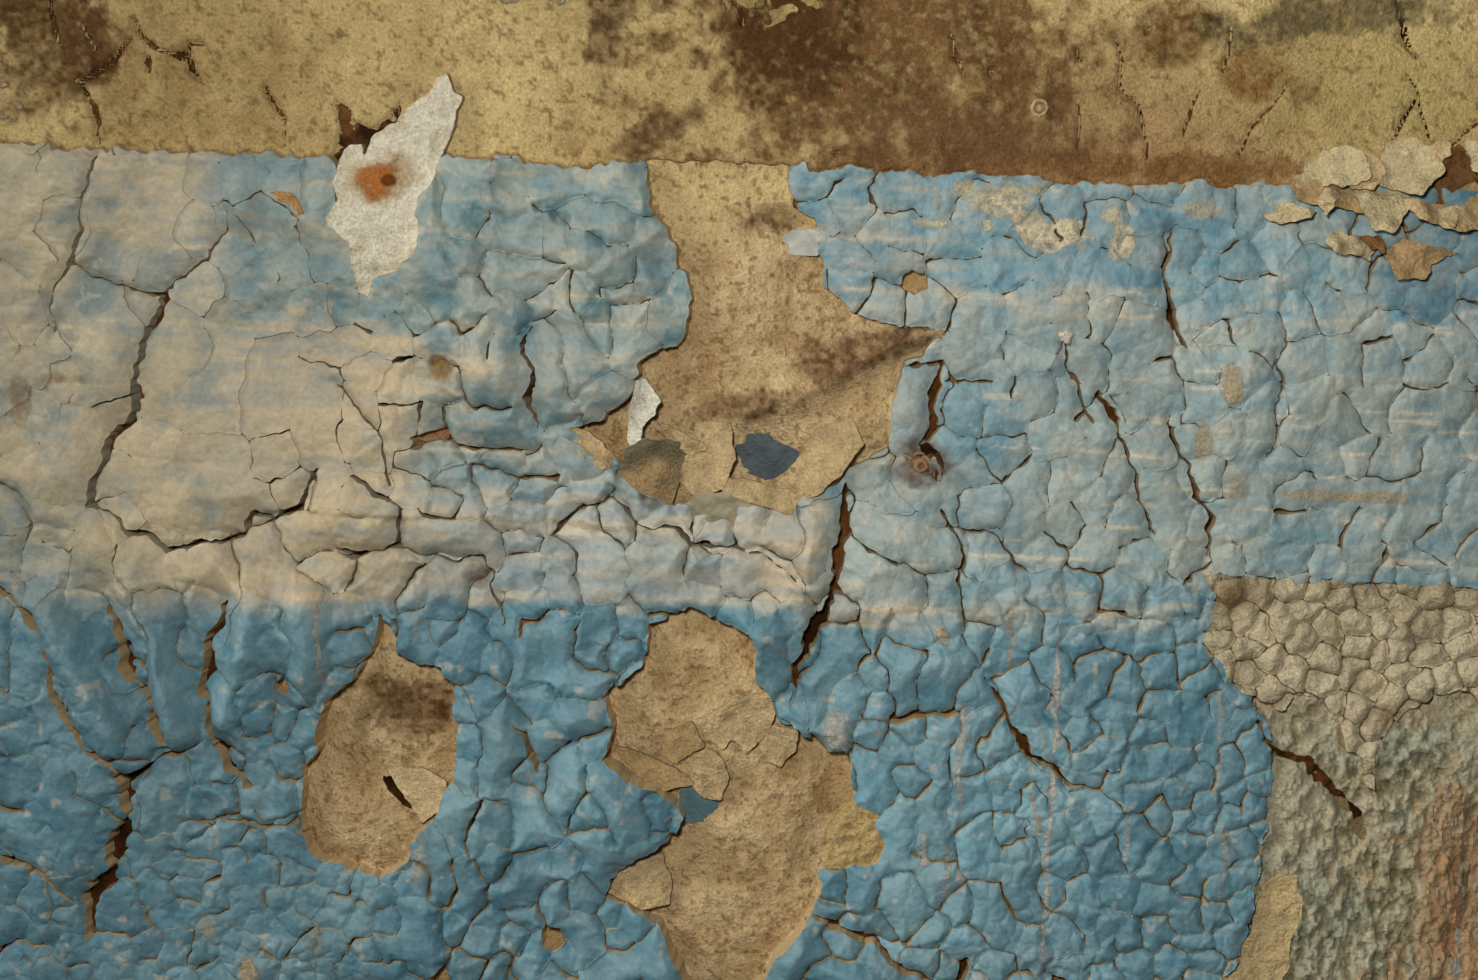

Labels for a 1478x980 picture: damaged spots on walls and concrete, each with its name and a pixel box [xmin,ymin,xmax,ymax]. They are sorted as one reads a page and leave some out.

leakage [0,0,117,96]
peeling [722,0,820,28]
leakage [711,0,1132,180]
leakage [1144,12,1222,62]
leakage [1263,0,1423,34]
corrosion [359,158,401,200]
peeling [0,102,1004,980]
crack [793,483,852,687]
peeling [781,137,1478,980]
crack [383,776,412,809]
crack [1267,743,1362,819]
crack [90,759,157,927]